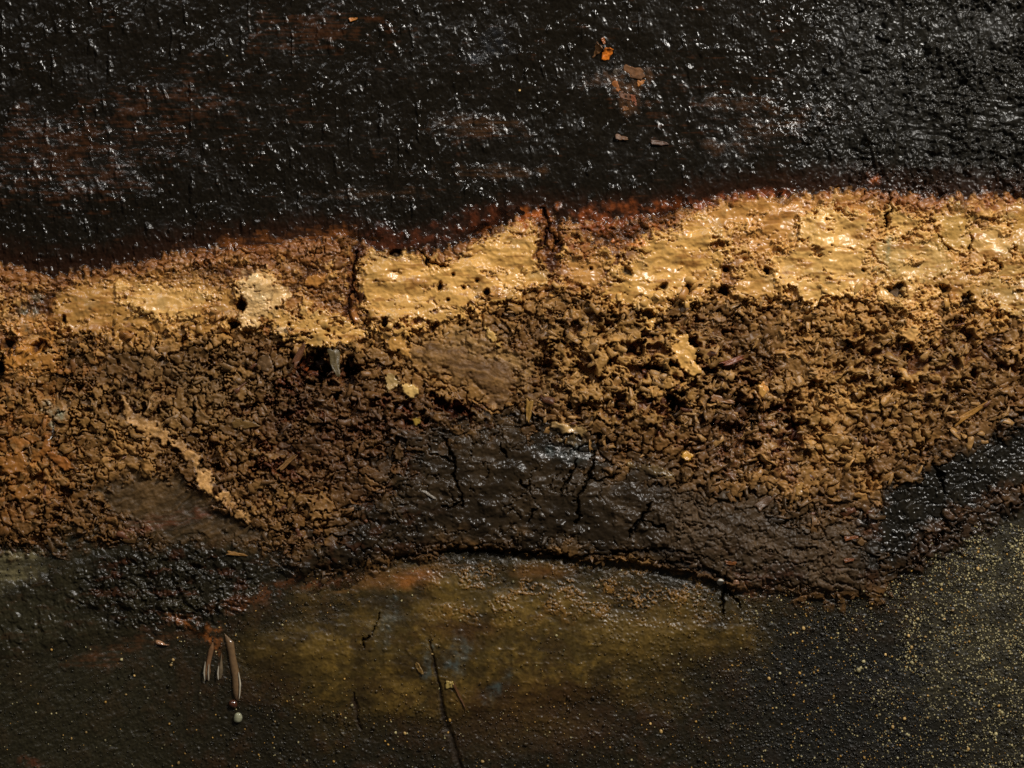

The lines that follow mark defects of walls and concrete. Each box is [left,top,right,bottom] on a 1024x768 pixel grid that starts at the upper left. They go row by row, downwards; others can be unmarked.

peeling [592,37,645,112]
crack [538,207,562,252]
rust [141,170,1024,276]
crack [440,436,464,510]
crack [499,444,507,459]
crack [519,479,537,520]
crack [560,451,622,524]
crack [428,639,465,768]